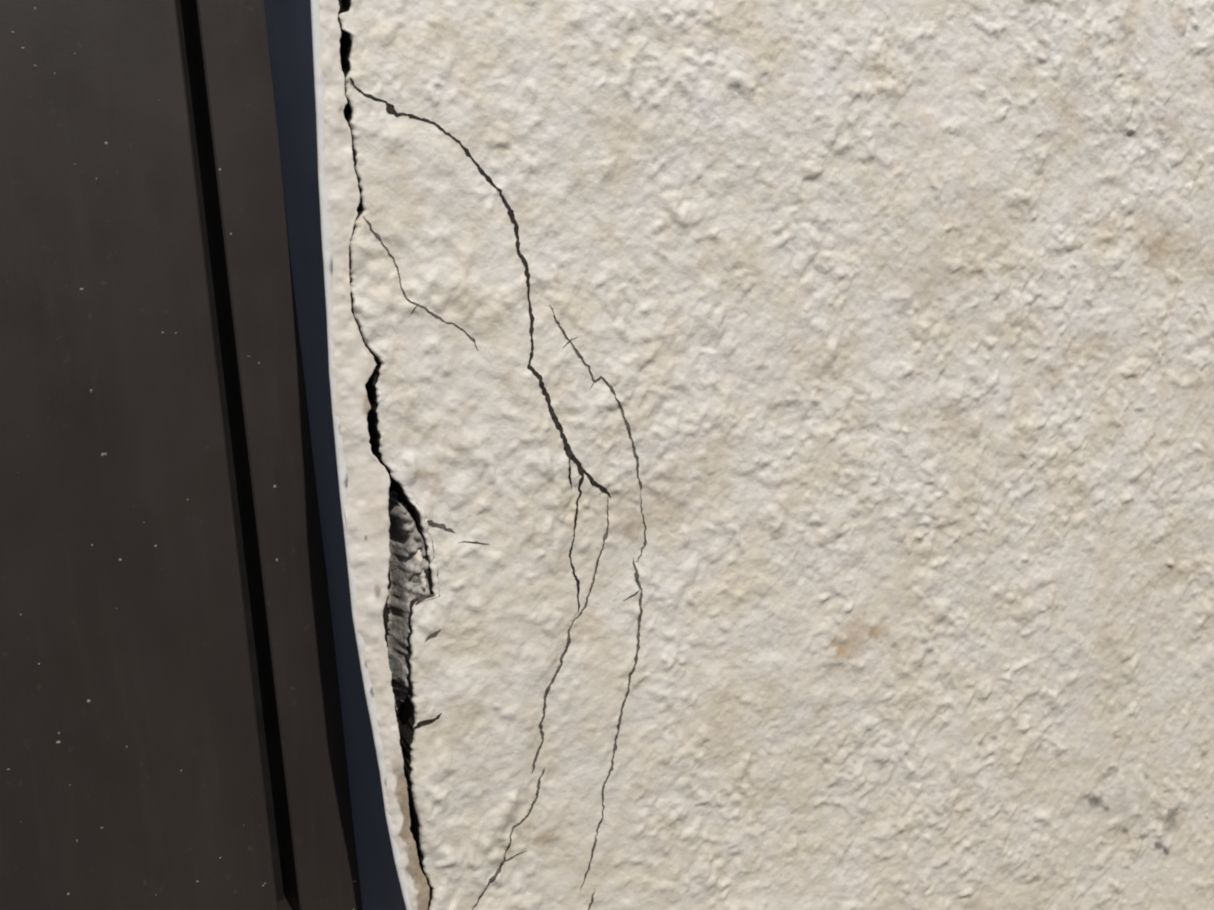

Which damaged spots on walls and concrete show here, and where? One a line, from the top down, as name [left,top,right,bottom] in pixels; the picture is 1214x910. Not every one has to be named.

crack [338,0,647,910]